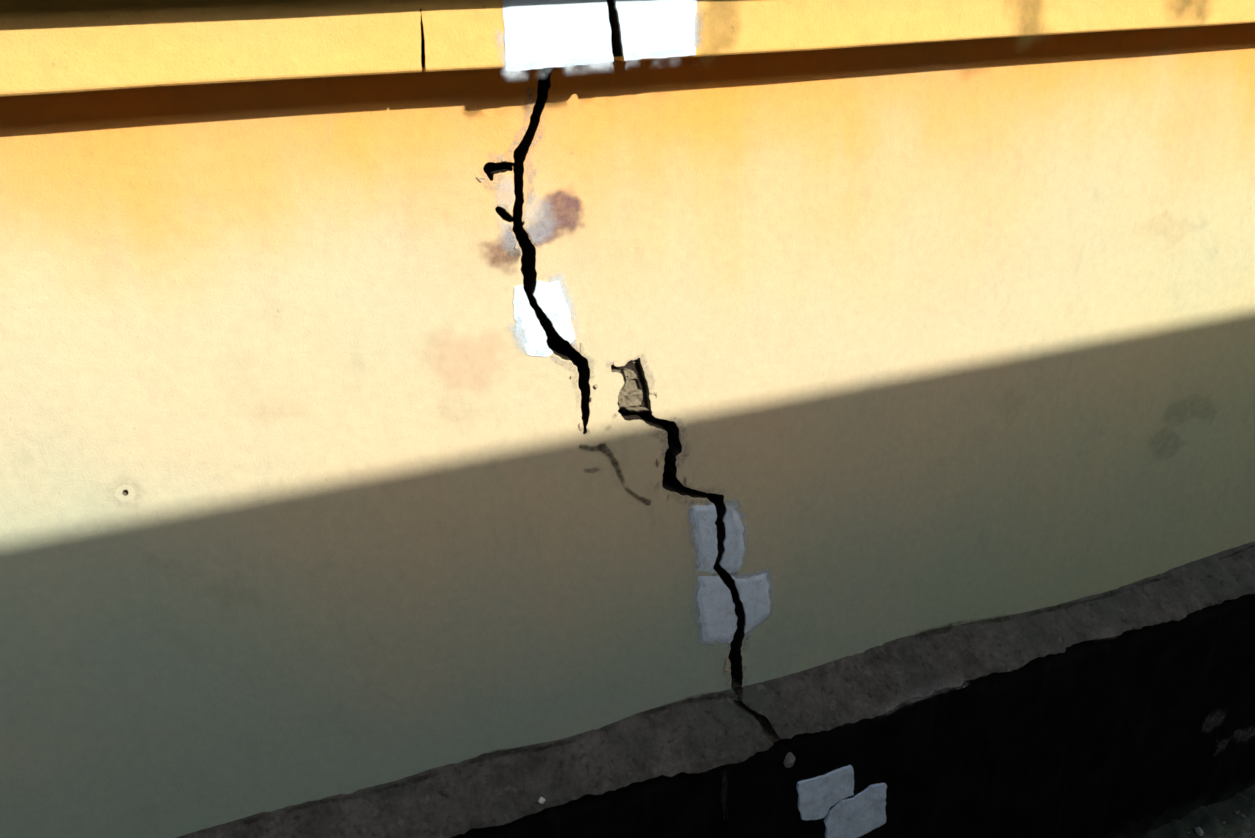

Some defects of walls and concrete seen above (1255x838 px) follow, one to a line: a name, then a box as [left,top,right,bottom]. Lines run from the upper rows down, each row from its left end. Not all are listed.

crack [607,0,622,57]
leakage [512,192,580,256]
crack [477,67,780,742]
spalling [1202,709,1255,755]